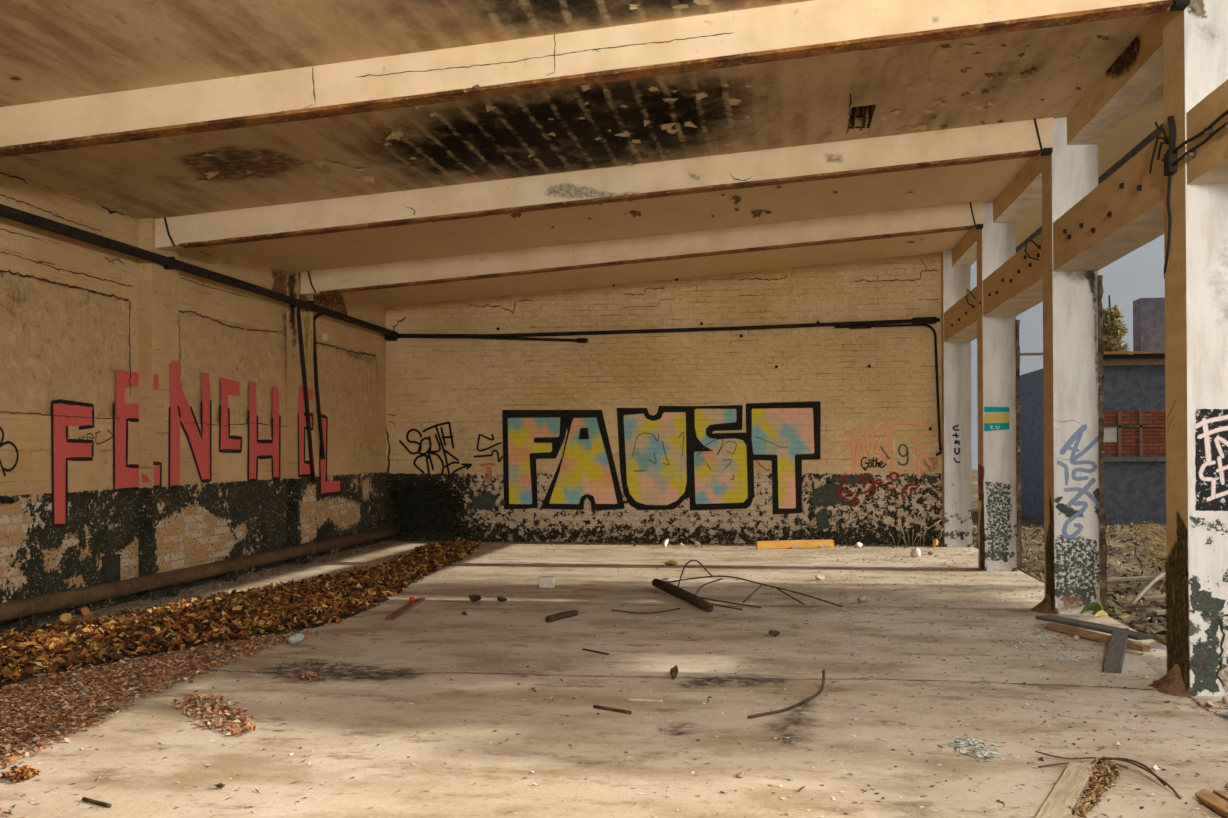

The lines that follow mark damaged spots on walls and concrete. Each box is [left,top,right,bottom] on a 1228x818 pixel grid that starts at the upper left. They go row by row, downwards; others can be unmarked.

damp [183,147,299,180]
peeling [0,495,30,596]
peeling [40,531,139,590]
peeling [153,501,248,585]
peeling [471,492,505,512]
peeling [985,481,1012,561]
peeling [1054,488,1099,519]
peeling [1054,534,1100,607]
peeling [1189,516,1228,544]
peeling [1187,569,1228,695]